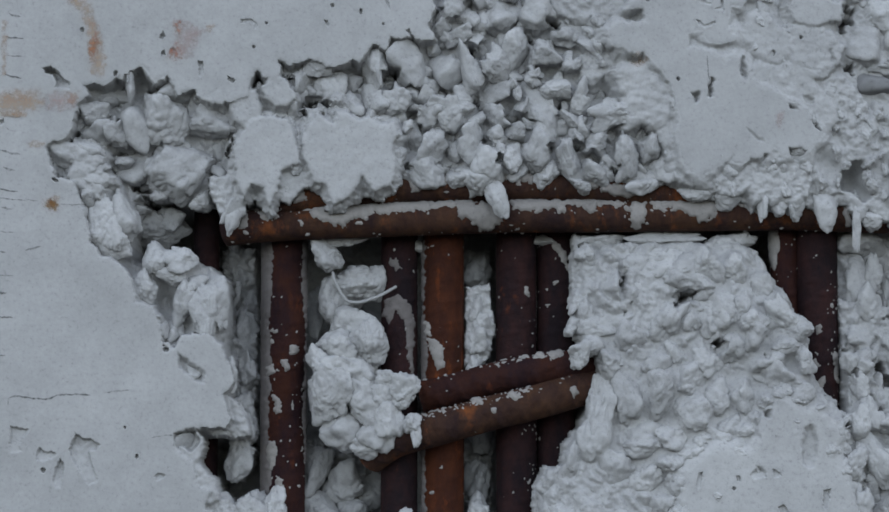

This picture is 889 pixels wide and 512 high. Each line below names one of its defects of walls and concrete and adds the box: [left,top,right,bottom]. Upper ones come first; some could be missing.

spalling [40,64,73,93]
spalling [128,172,889,512]